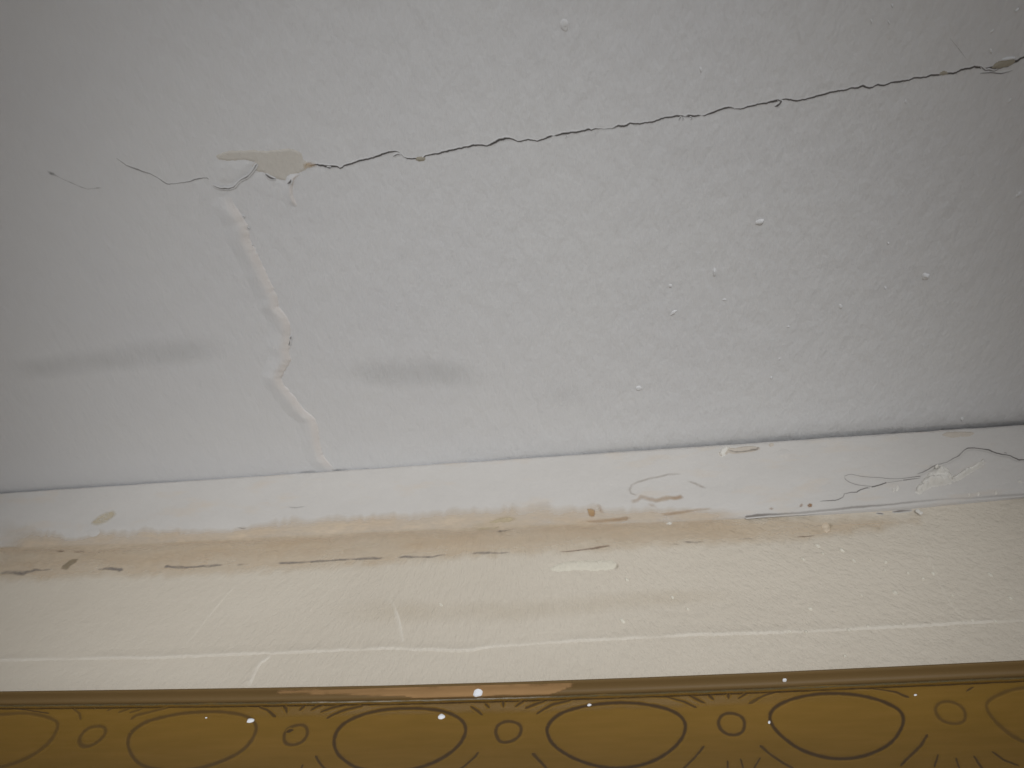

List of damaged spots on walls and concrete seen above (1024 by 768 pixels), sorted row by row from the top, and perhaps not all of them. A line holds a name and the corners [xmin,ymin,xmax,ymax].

crack [310,55,1024,170]
crack [116,157,258,190]
peeling [214,148,311,207]
crack [745,446,1024,537]
leakage [19,511,660,568]